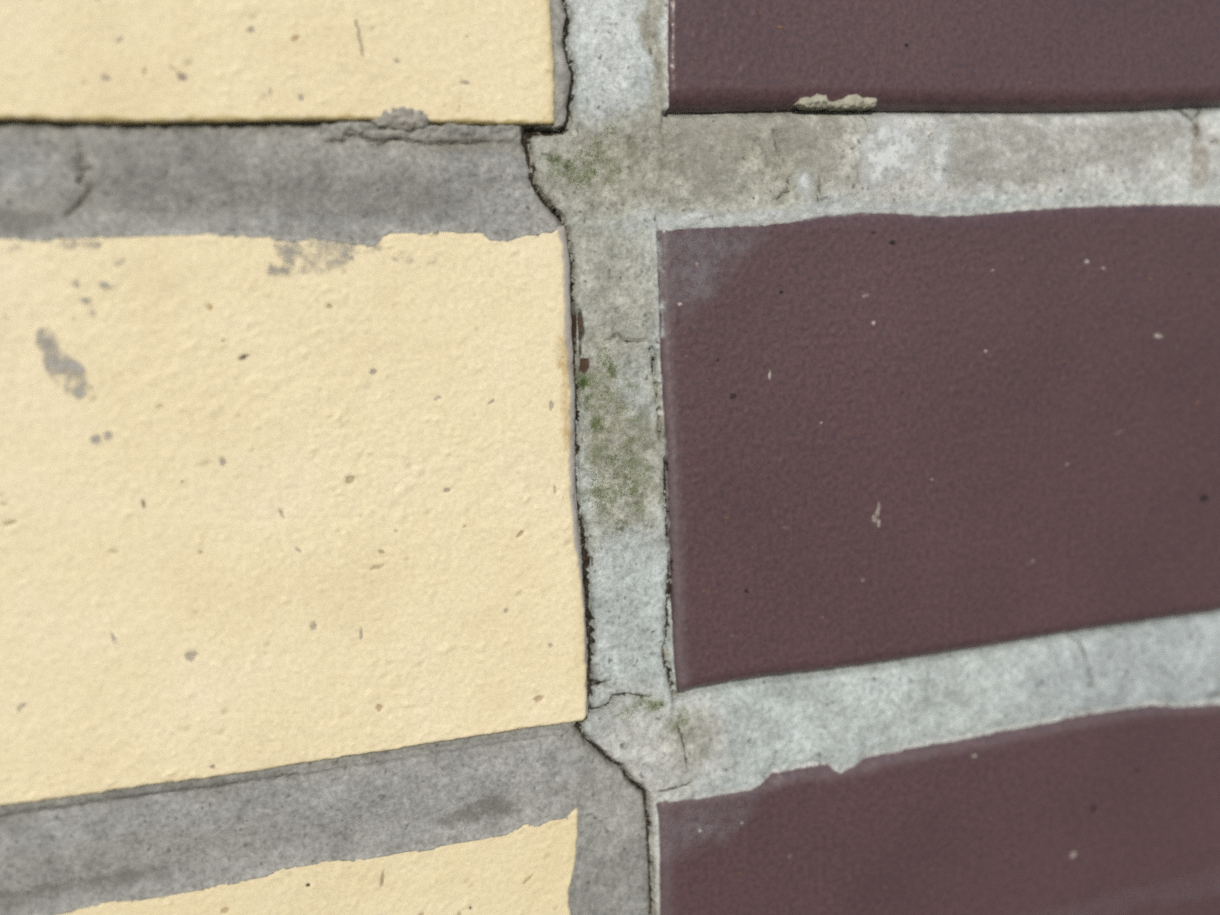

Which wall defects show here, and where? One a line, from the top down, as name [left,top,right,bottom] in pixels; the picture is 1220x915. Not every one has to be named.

crack [521,0,692,915]